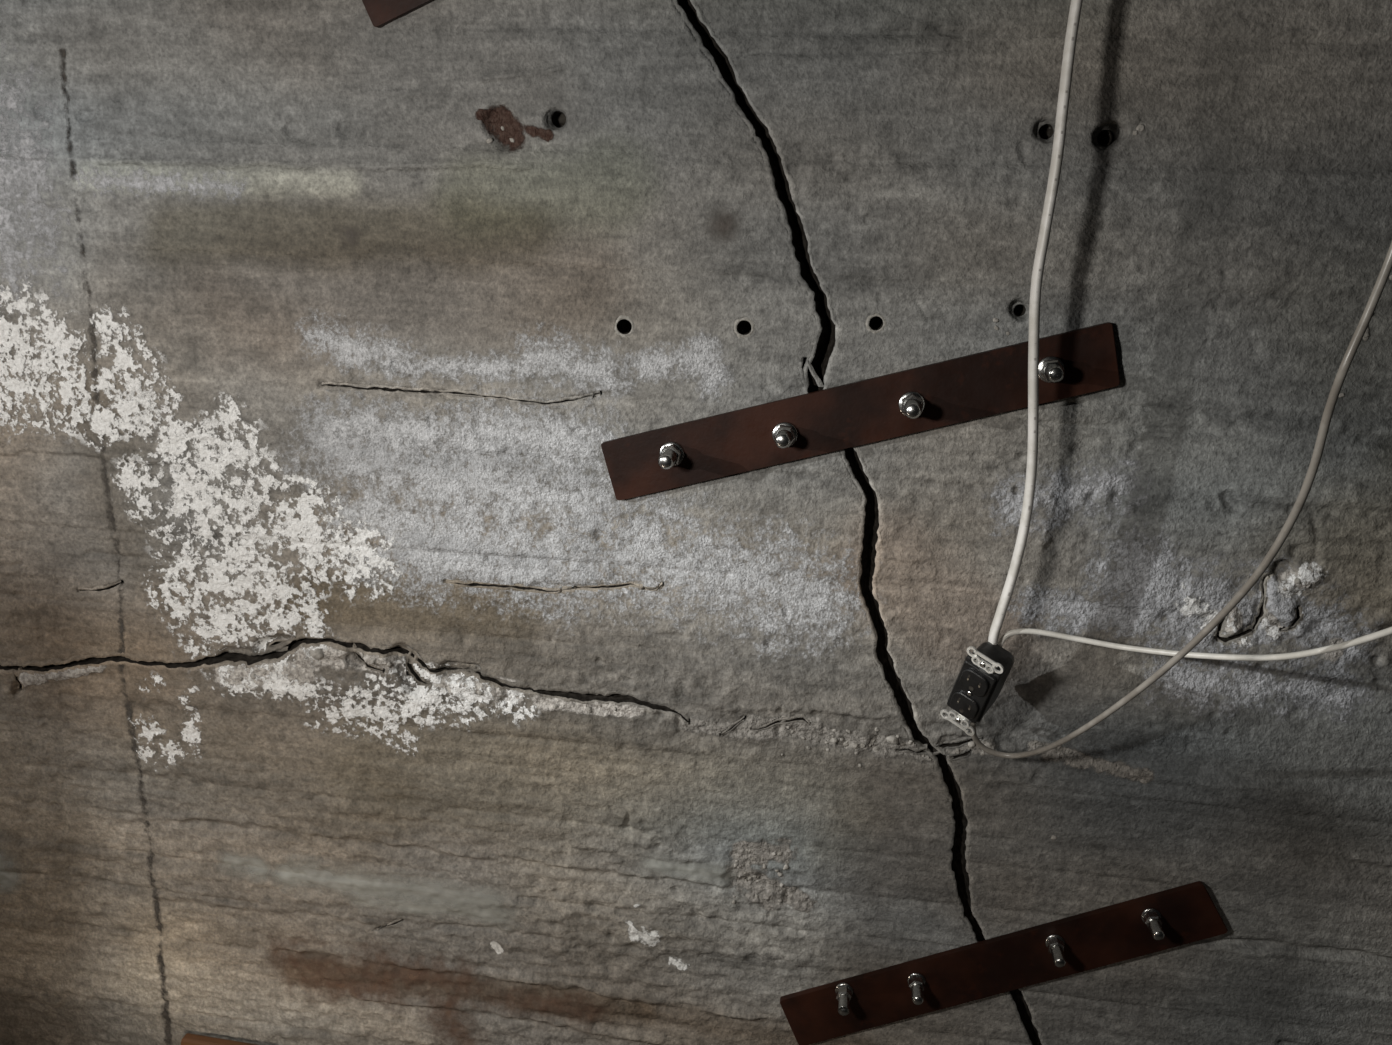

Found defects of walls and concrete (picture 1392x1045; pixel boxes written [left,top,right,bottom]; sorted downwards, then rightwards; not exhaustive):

crack [673,0,842,394]
leakage [0,67,868,771]
crack [320,382,600,407]
crack [445,579,663,594]
spalling [1278,563,1323,596]
spalling [1225,607,1244,645]
spalling [1261,611,1283,637]
spalling [19,665,106,687]
crack [0,635,690,725]
spalling [215,635,645,718]
crack [840,446,990,943]
crack [1006,988,1047,1045]